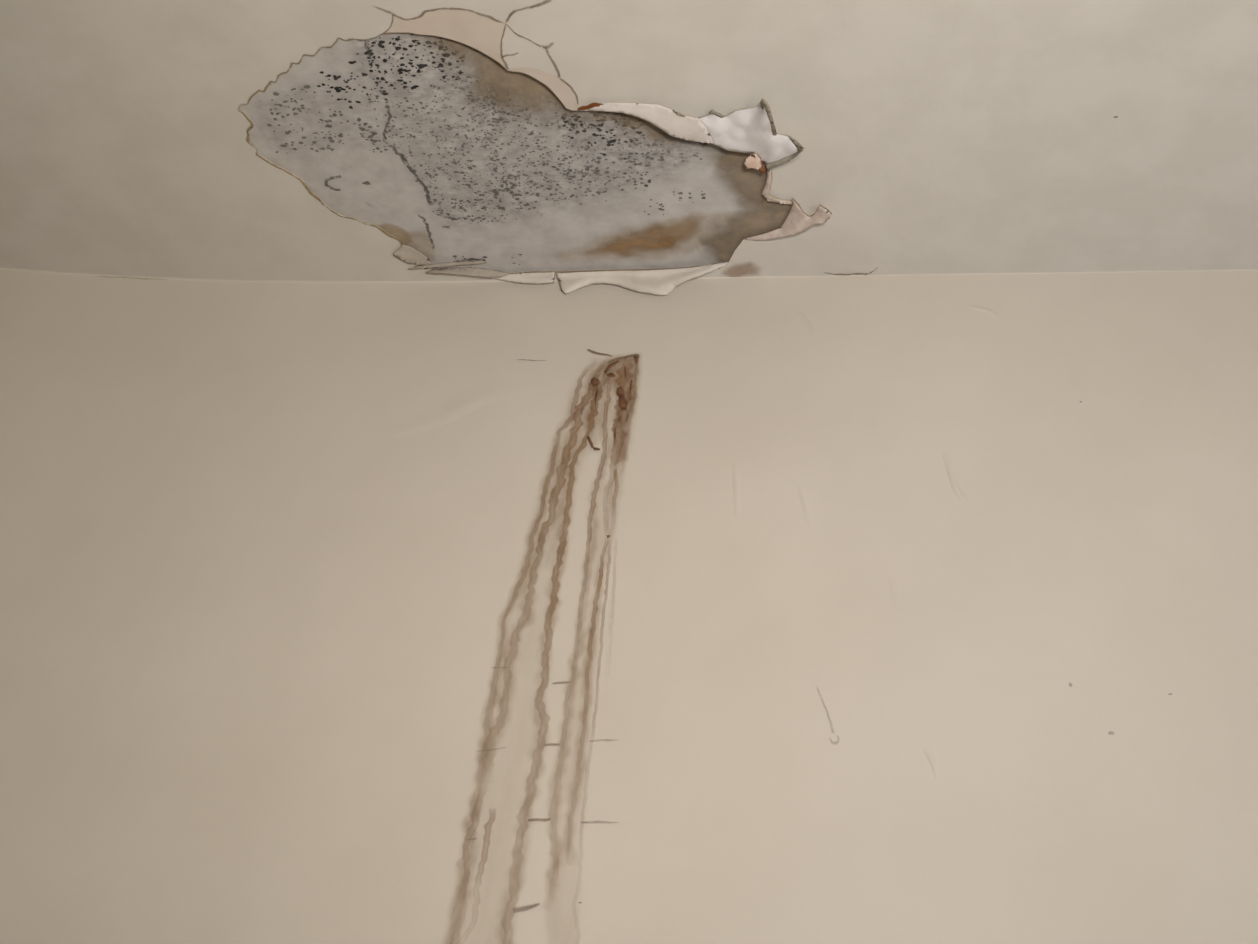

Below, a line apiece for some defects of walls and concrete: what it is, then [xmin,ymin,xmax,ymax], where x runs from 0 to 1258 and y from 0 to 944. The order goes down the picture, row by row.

crack [378,1,578,104]
damp [267,34,792,263]
peeling [239,8,832,296]
damp [552,356,638,522]